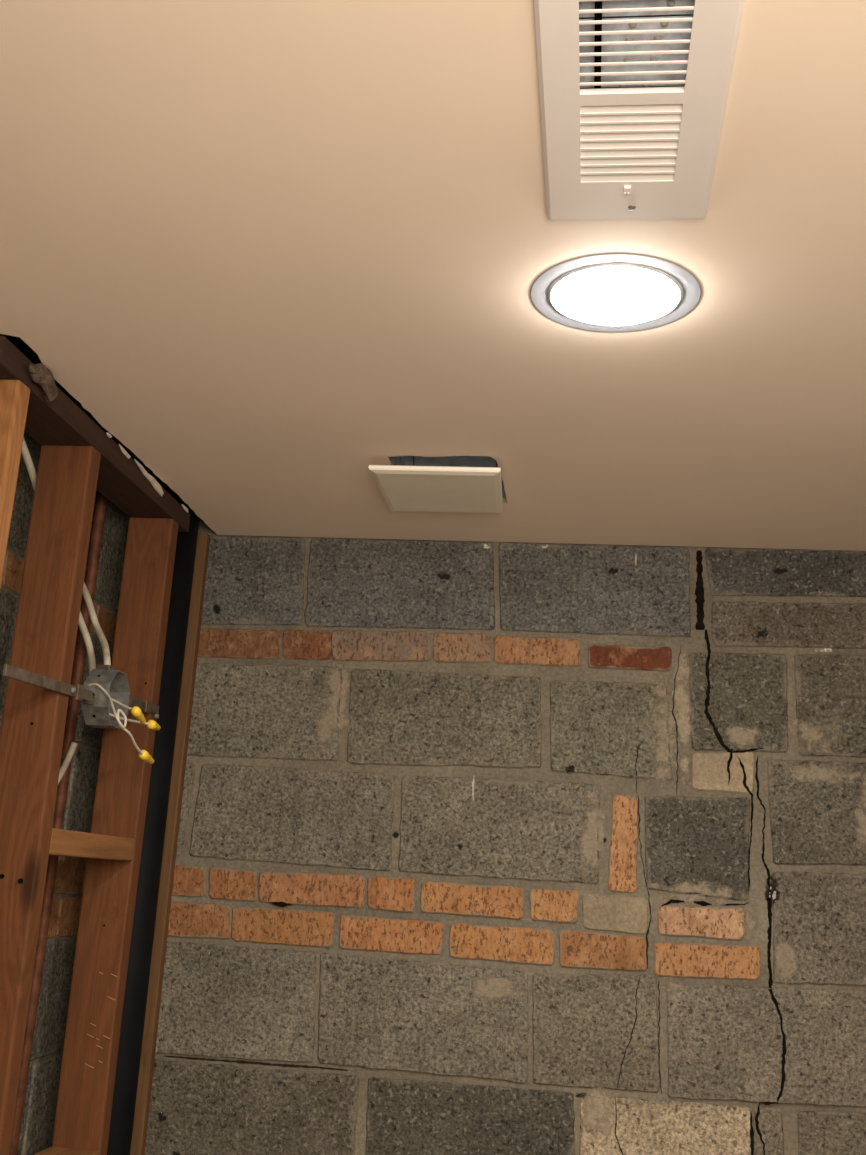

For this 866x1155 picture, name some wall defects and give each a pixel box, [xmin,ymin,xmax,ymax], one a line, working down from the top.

crack [615,741,662,1155]
crack [672,630,787,1155]